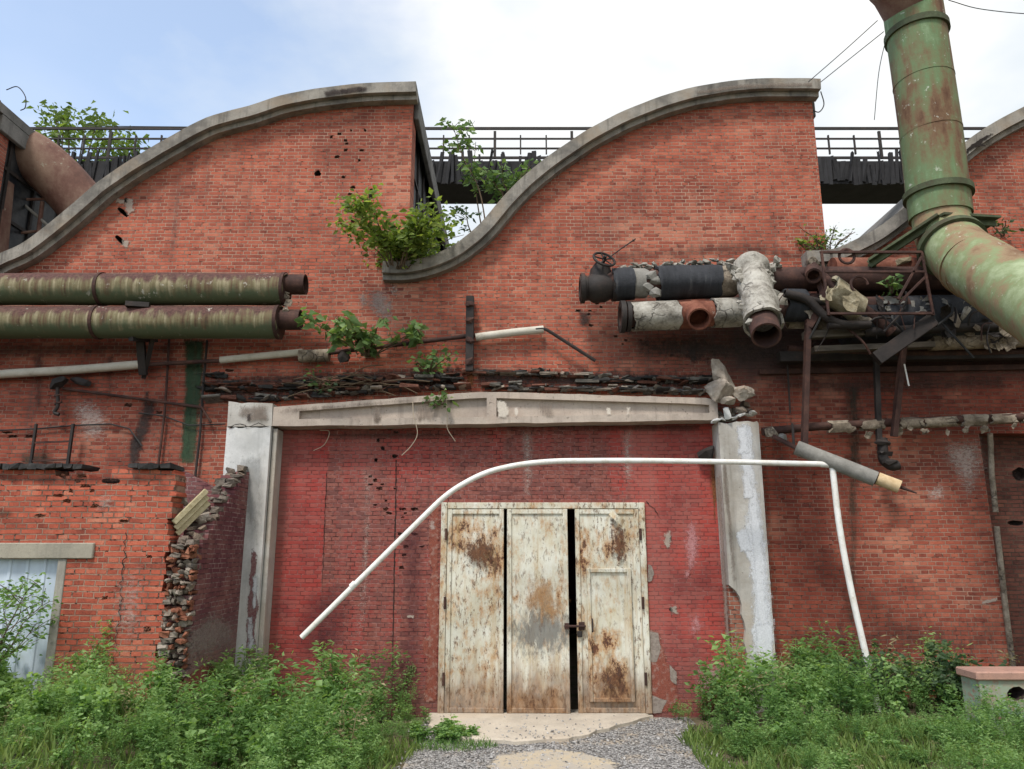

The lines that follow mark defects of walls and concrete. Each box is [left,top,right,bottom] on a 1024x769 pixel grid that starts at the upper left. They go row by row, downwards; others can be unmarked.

damp [130,438,141,463]
rust [457,529,498,575]
peeling [196,355,774,714]
rust [606,523,631,576]
crack [115,532,127,660]
rust [525,579,563,624]